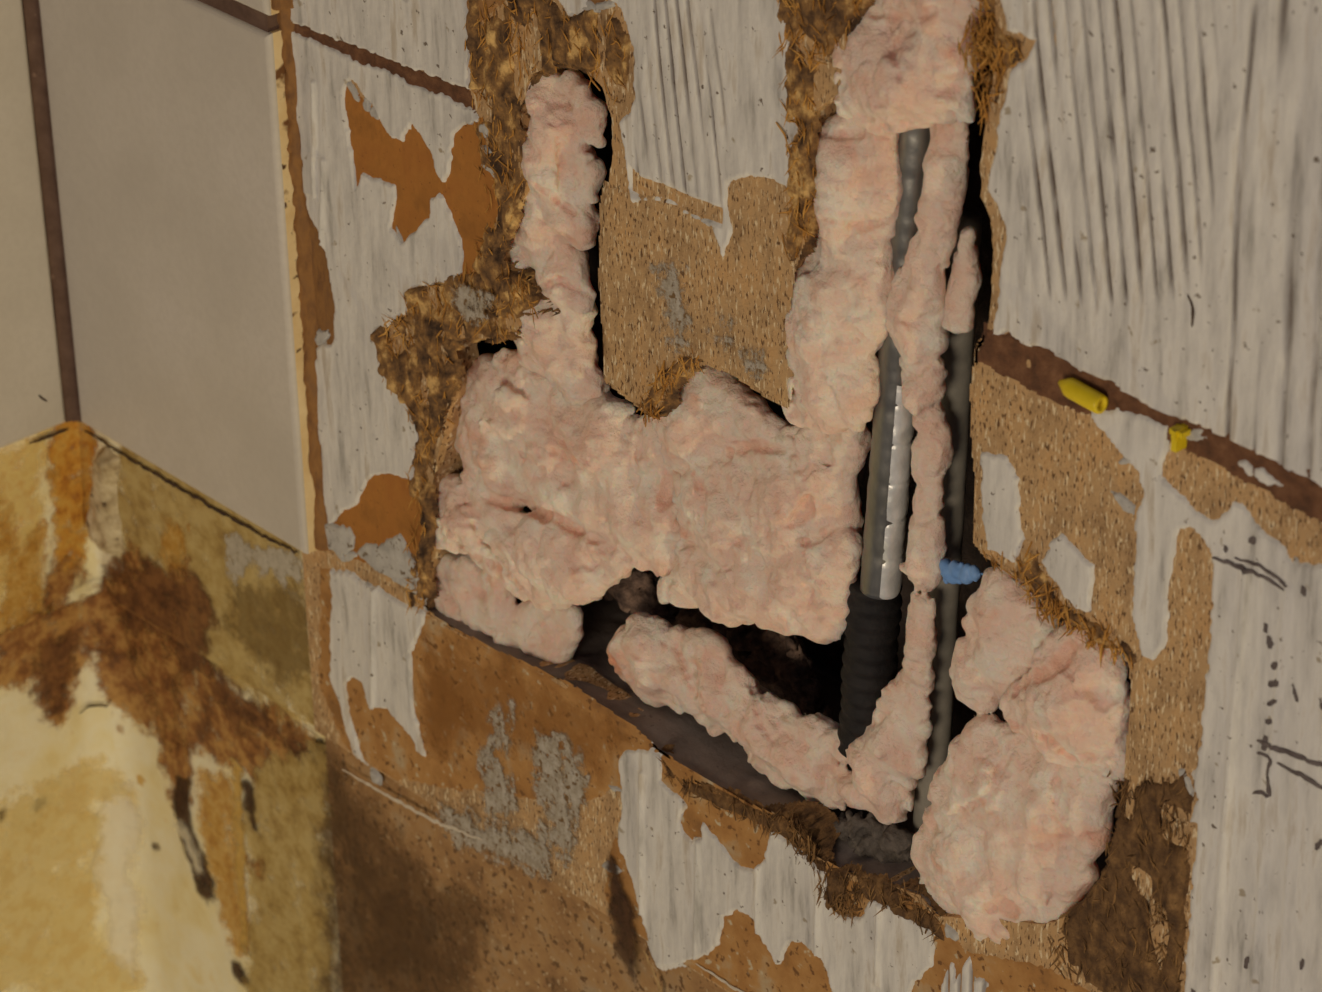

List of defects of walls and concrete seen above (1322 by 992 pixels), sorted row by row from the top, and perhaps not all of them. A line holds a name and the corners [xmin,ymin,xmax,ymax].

peeling [345,81,498,326]
peeling [598,175,807,414]
leakage [0,429,49,635]
leakage [117,446,314,725]
peeling [319,474,870,917]
peeling [969,335,1228,797]
peeling [1162,429,1322,567]
leakage [0,758,142,992]
spalling [173,776,215,900]
leakage [241,741,336,992]
leakage [607,855,636,981]
peeling [685,910,832,992]